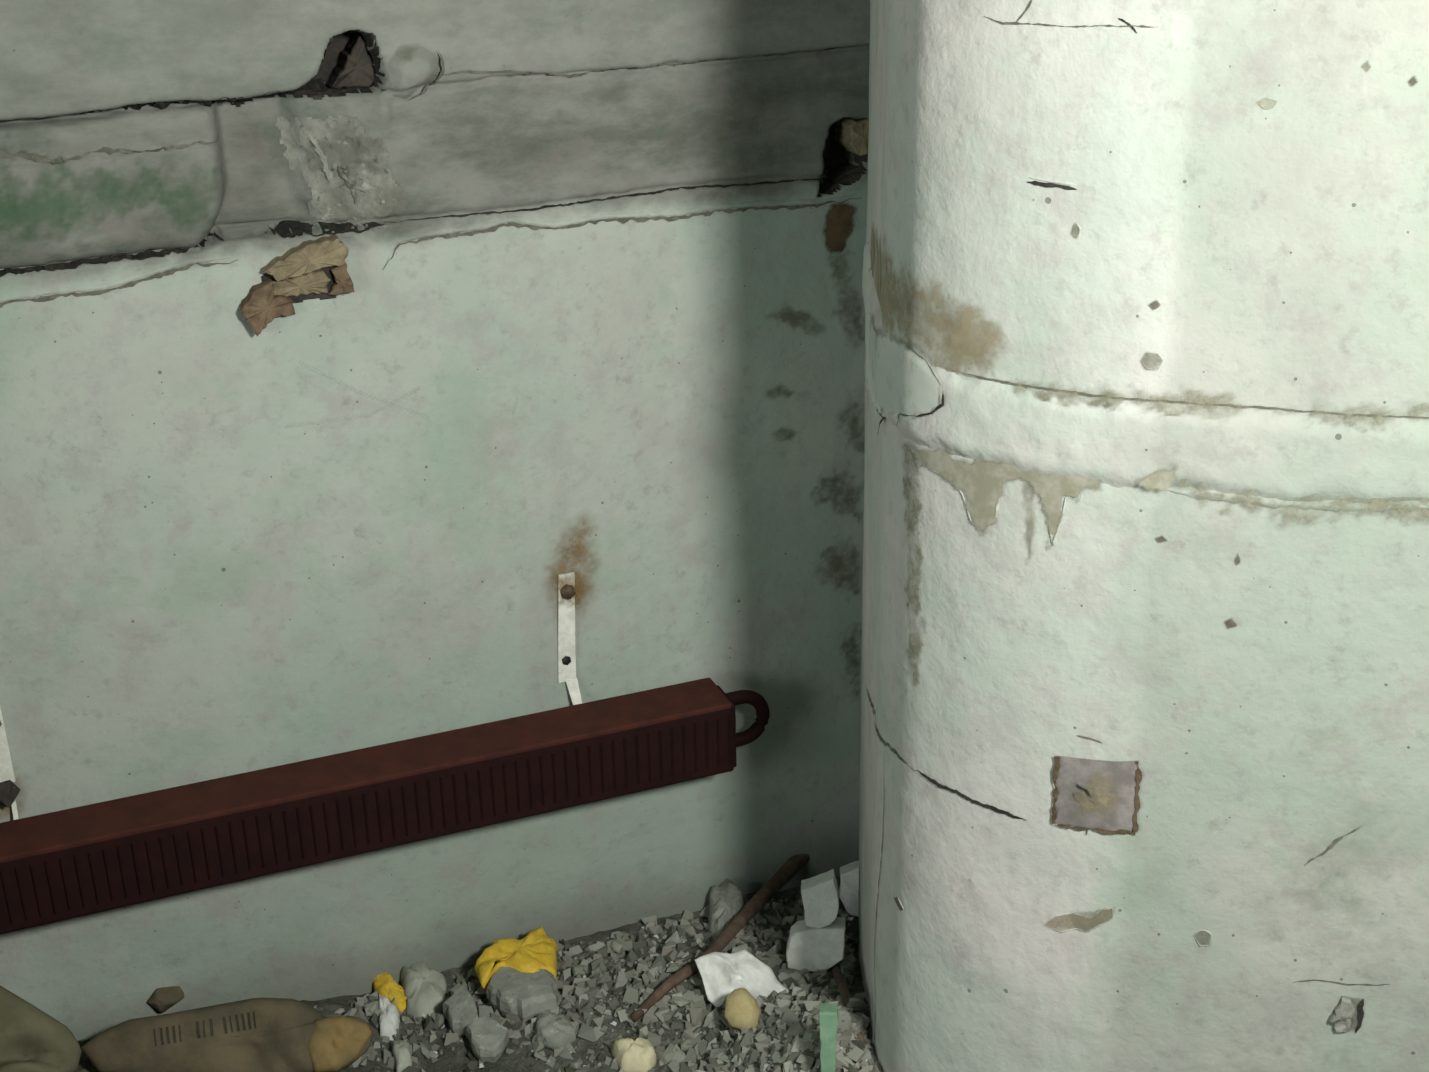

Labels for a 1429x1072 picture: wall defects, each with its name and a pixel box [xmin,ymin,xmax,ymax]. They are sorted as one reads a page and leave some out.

spalling [231,29,385,107]
crack [434,45,870,78]
crack [0,77,329,164]
crack [0,233,224,277]
spalling [239,115,869,336]
crack [265,167,867,238]
peeling [907,443,1101,549]
peeling [1138,468,1175,491]
rust [554,531,589,600]
crack [866,690,1025,820]